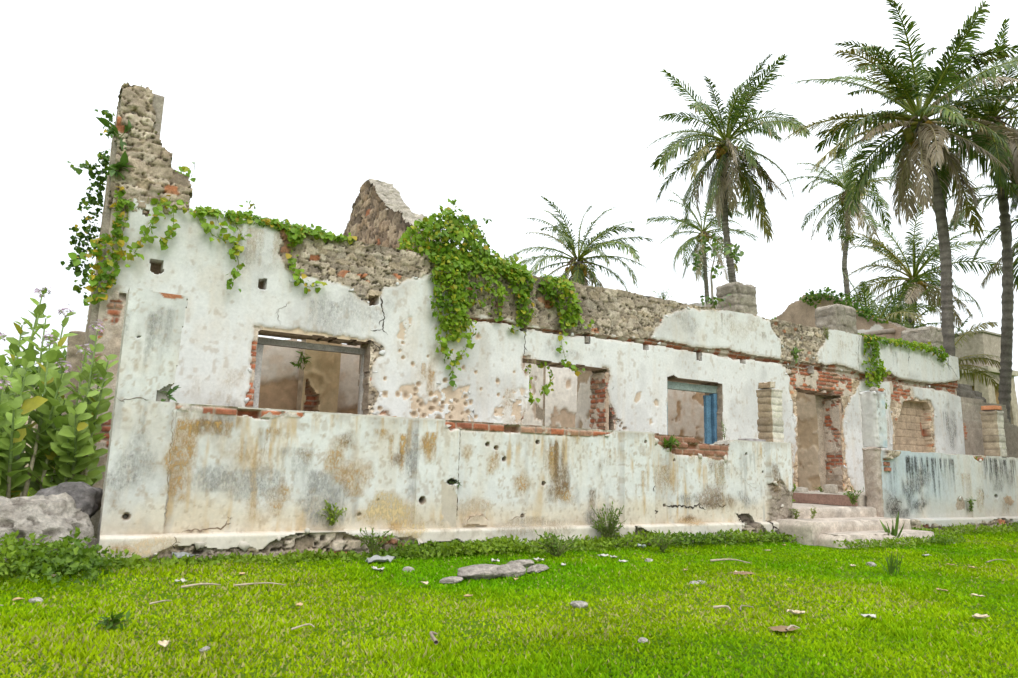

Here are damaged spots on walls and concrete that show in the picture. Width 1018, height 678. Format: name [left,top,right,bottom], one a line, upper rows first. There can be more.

spalling [279,229,720,345]
crack [367,297,388,351]
peeling [397,317,416,366]
spalling [176,325,627,437]
spalling [650,418,730,463]
spalling [713,315,861,543]
peeling [883,382,937,471]
water stain [364,492,424,538]
water stain [441,479,489,527]
water stain [683,486,733,508]
water stain [887,456,954,517]
spalling [139,528,477,563]